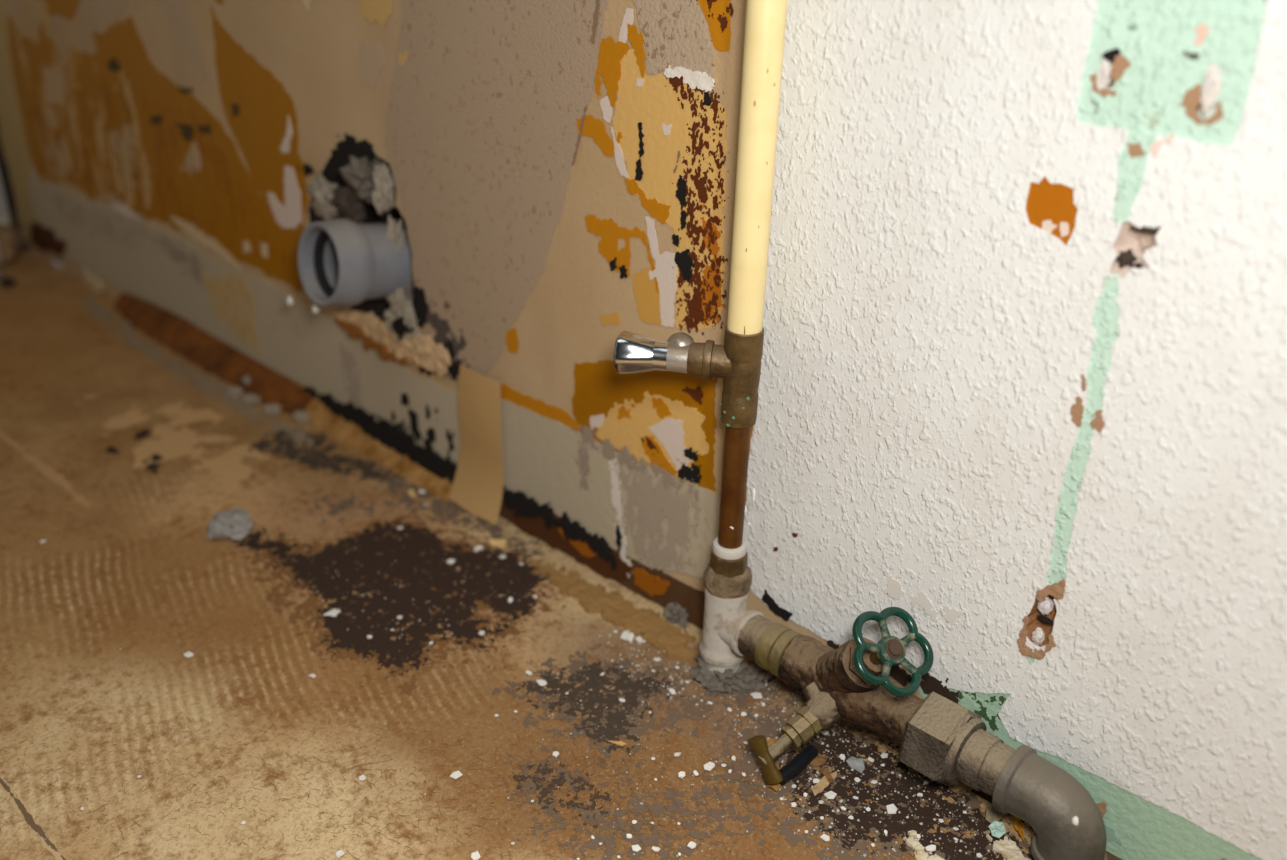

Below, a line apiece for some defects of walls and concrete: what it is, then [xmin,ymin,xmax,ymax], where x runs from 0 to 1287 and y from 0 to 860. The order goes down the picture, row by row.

corrosion [691,0,734,41]
peeling [698,0,731,51]
peeling [7,0,407,292]
peeling [576,7,727,330]
corrosion [665,62,729,335]
leakage [303,340,457,483]
flaking render [333,268,456,377]
peeling [500,360,717,491]
leakage [682,386,703,405]
leakage [1070,374,1105,432]
peeling [1026,0,1267,666]
leakage [103,401,1035,860]